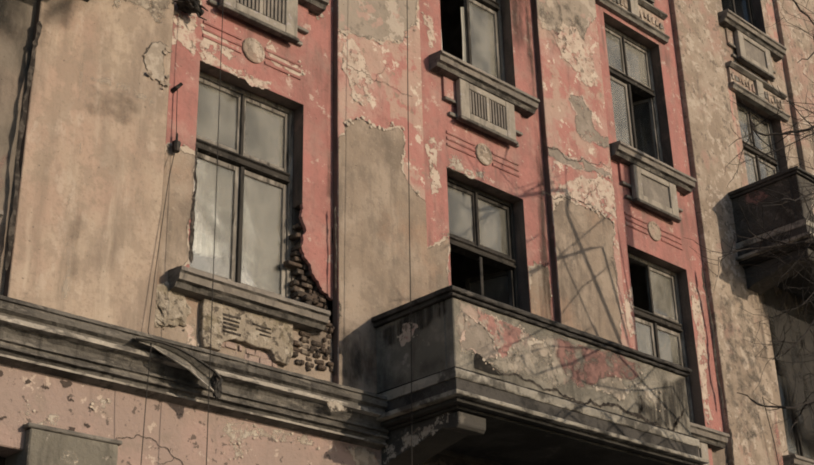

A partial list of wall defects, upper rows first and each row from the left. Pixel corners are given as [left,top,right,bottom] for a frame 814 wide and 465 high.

peeling [113,0,271,89]
peeling [265,40,305,76]
peeling [328,0,436,106]
peeling [537,0,598,87]
peeling [569,95,610,148]
peeling [154,116,491,394]
peeling [528,146,637,344]
peeling [456,301,642,401]
peeling [689,282,713,424]
crack [118,434,183,464]
peeling [223,419,320,450]
crack [492,366,685,431]